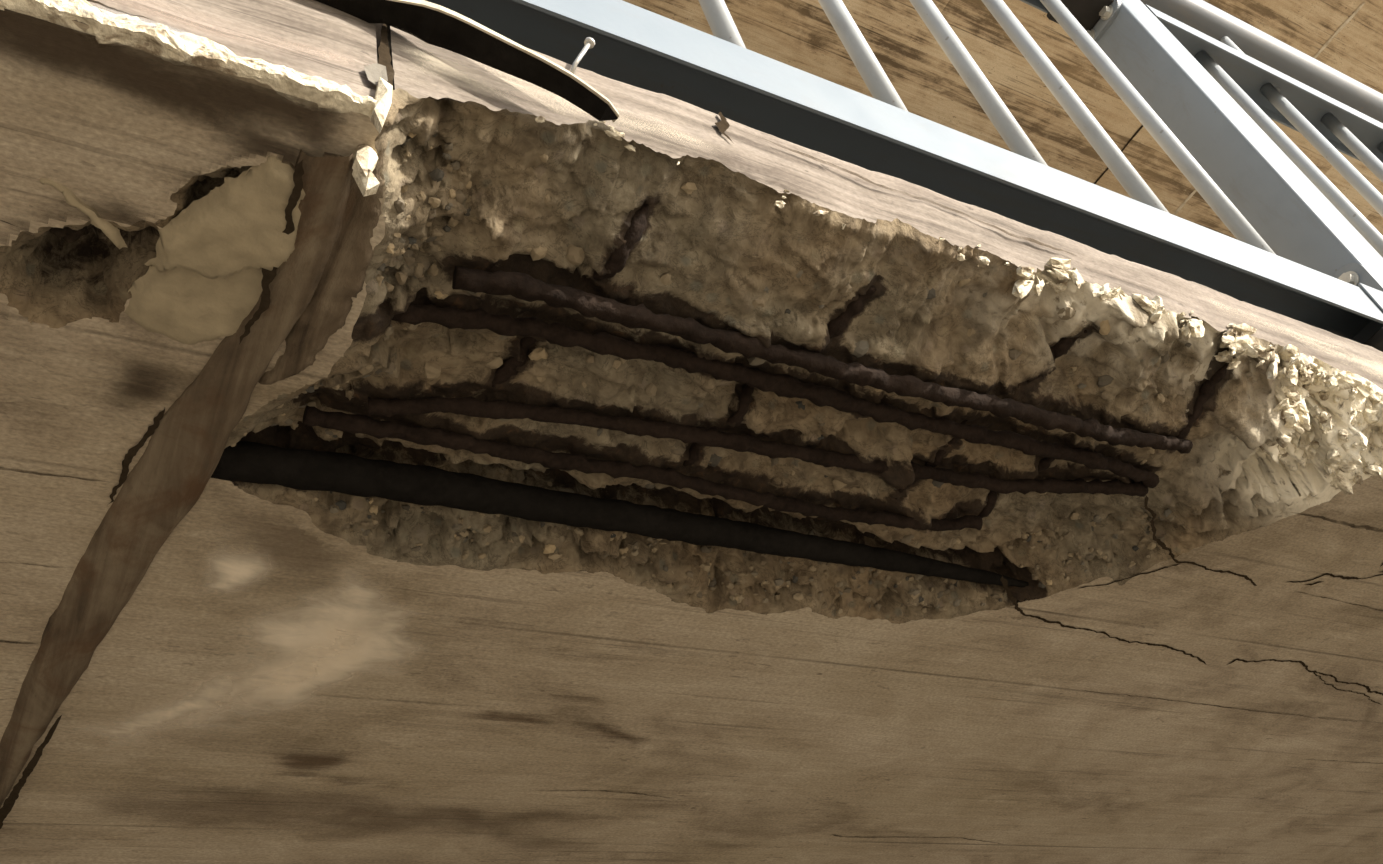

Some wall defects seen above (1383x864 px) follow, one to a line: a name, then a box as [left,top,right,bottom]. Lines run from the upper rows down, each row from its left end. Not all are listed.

crack [283,160,304,235]
crack [239,267,277,344]
spalling [0,0,1383,624]
crack [0,408,165,504]
crack [1078,495,1257,589]
crack [1299,513,1383,532]
crack [0,638,35,646]
crack [1000,573,1383,722]
crack [0,715,62,829]